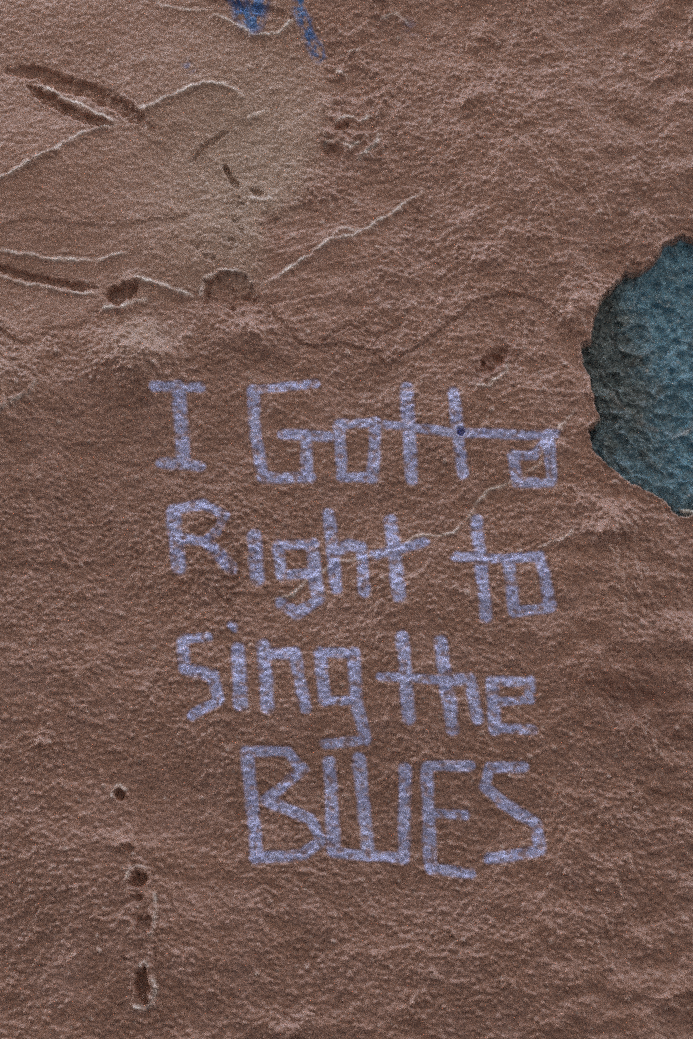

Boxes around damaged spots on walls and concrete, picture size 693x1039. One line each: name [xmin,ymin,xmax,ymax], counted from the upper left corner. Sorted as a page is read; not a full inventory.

crack [263,288,582,371]
flaking render [574,228,693,525]